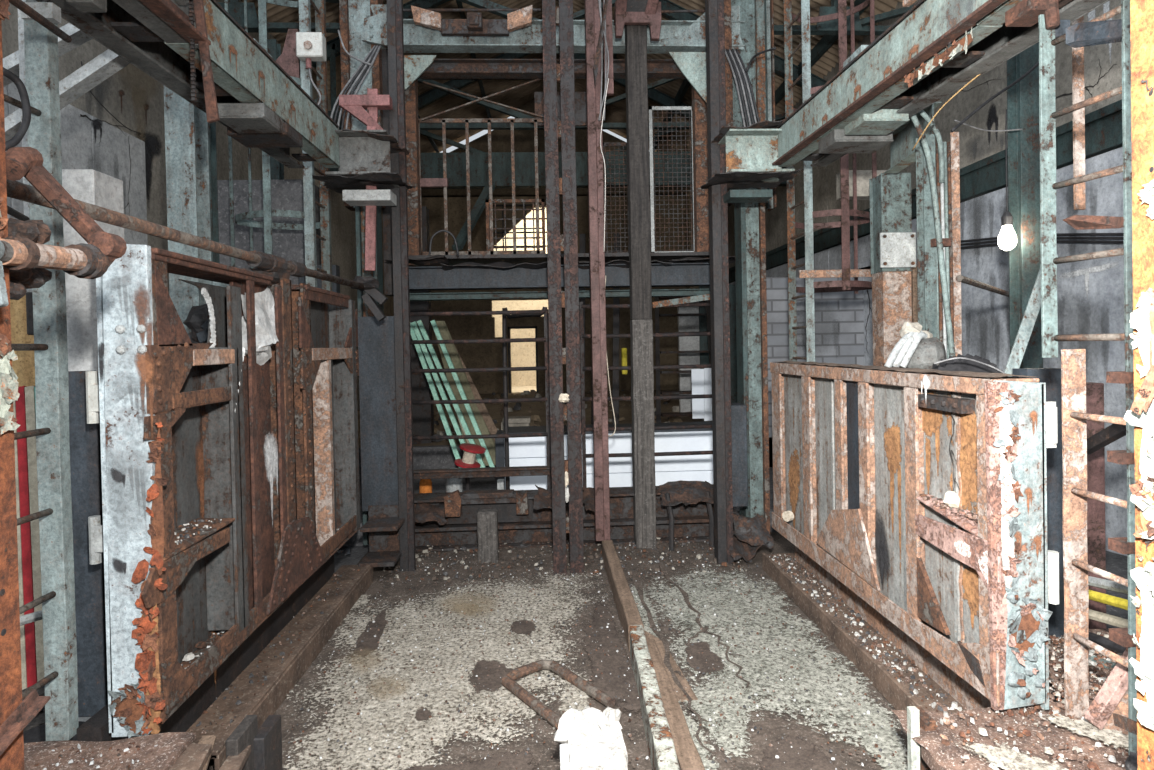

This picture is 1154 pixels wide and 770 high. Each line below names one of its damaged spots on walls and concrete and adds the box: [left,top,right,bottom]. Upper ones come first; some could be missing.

peeling [0,333,20,435]
peeling [108,422,168,738]
rust [134,287,154,428]
rust [788,448,800,528]
rust [883,422,902,573]
rust [922,391,978,514]
rust [954,541,997,632]
peeling [993,389,1053,667]
rust [1011,411,1038,444]
peeling [1123,398,1154,540]
peeling [1129,288,1154,378]
peeling [1129,555,1154,730]